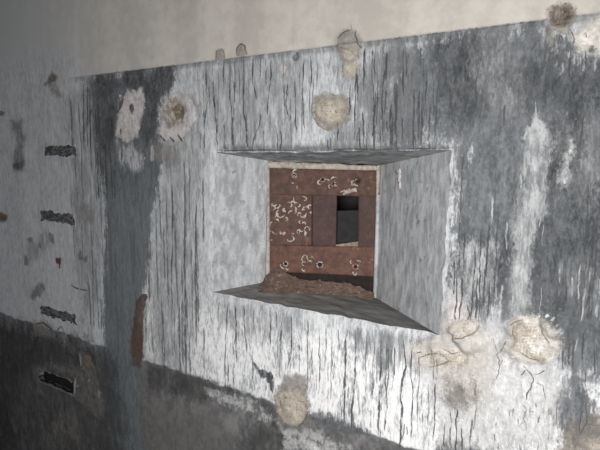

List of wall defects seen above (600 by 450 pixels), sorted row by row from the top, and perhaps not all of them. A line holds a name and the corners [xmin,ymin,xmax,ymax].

peeling [545,3,600,55]
peeling [115,87,154,173]
flaking render [157,91,199,144]
damp [197,58,272,149]
flaking render [311,94,349,131]
damp [70,66,205,450]
damp [262,21,600,450]
corrosion [130,323,144,366]
damp [224,307,247,388]
flaking render [253,362,312,429]
crack [518,367,546,427]